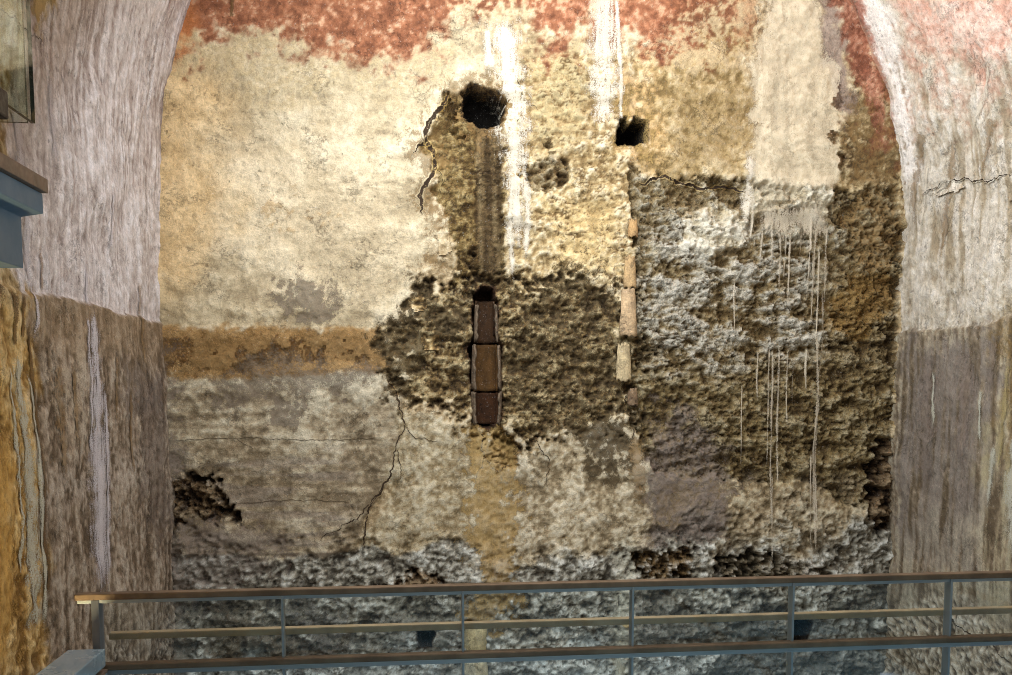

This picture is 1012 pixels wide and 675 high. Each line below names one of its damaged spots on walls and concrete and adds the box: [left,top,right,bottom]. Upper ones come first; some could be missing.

crack [413,95,449,215]
crack [638,173,745,194]
water stain [938,143,957,259]
water stain [972,63,997,172]
water stain [202,0,754,642]
flaking render [370,91,905,532]
water stain [739,71,932,560]
water stain [51,264,302,622]
flaking render [173,472,242,531]
crack [171,437,372,448]
crack [238,380,436,548]